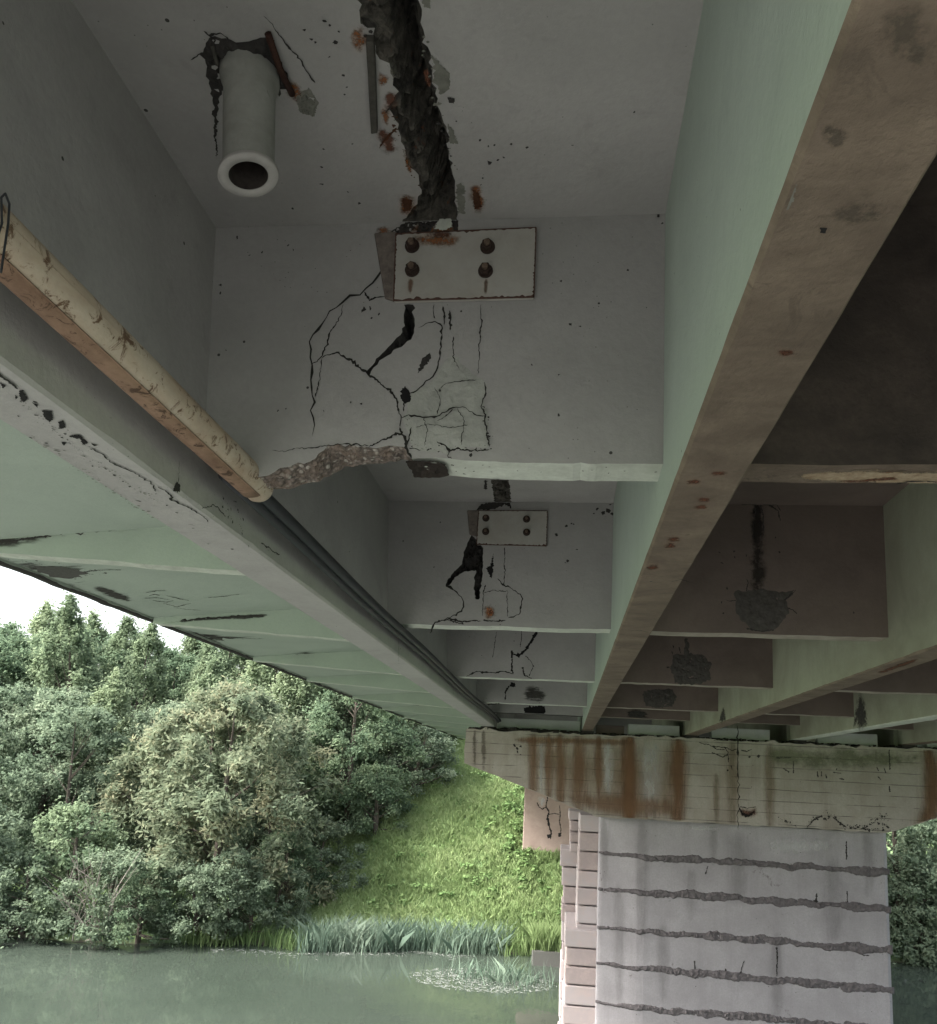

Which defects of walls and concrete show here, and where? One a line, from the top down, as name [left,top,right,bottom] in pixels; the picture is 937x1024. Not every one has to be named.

spalling [191,31,288,155]
corrosion [379,75,395,151]
spalling [358,0,466,233]
crack [274,272,489,459]
spalling [259,438,474,489]
crack [430,535,545,705]
crack [537,797,561,839]
corrosion [520,736,685,819]
crack [699,726,760,826]